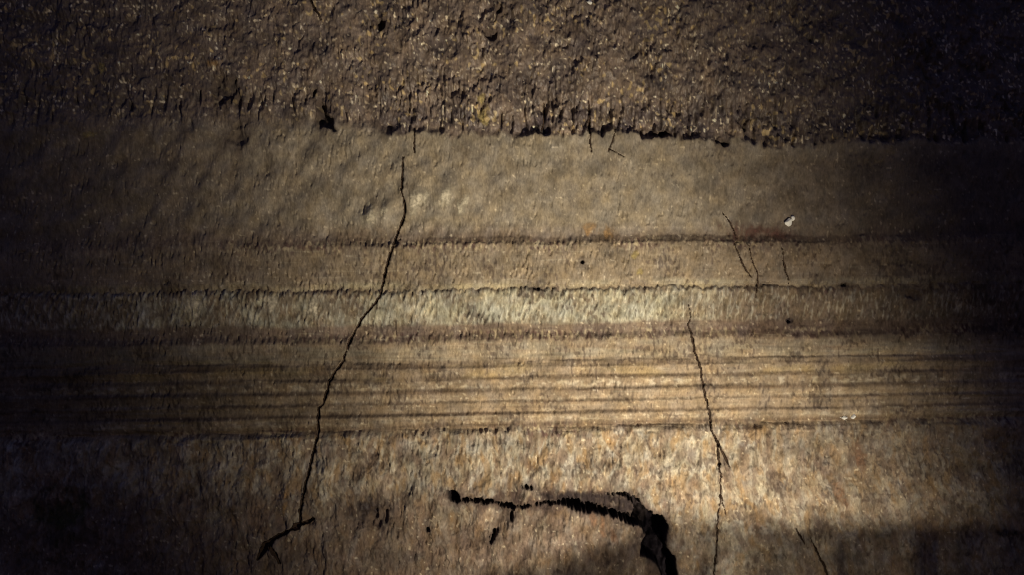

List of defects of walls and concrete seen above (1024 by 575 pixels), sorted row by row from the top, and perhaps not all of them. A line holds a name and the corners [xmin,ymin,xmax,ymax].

crack [257,129,416,564]
crack [688,304,730,575]
crack [722,212,759,298]